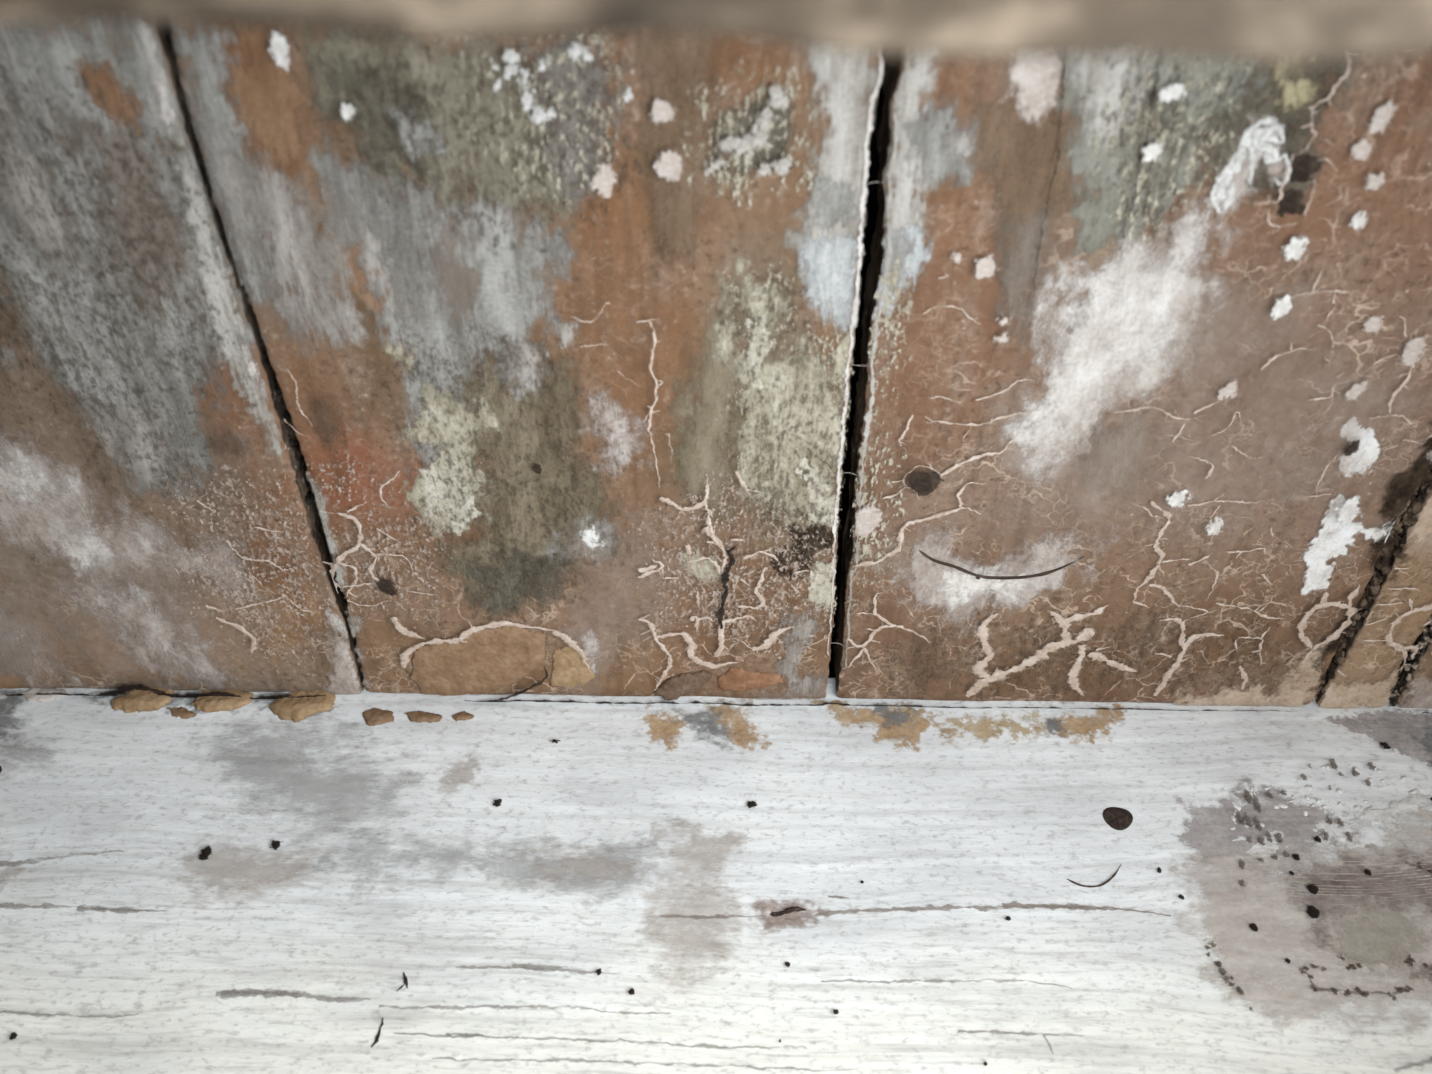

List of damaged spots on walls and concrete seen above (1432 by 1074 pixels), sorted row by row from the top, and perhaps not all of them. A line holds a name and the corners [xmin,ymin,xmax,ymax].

damp [0,19,620,619]
damp [637,31,795,263]
damp [670,49,882,617]
crack [197,302,1432,712]
crack [923,275,981,325]
damp [884,54,1357,344]
damp [1074,411,1169,492]
damp [1218,381,1238,400]
crack [1261,265,1432,450]
damp [0,690,42,758]
crack [5,684,326,700]
damp [1172,808,1432,1031]